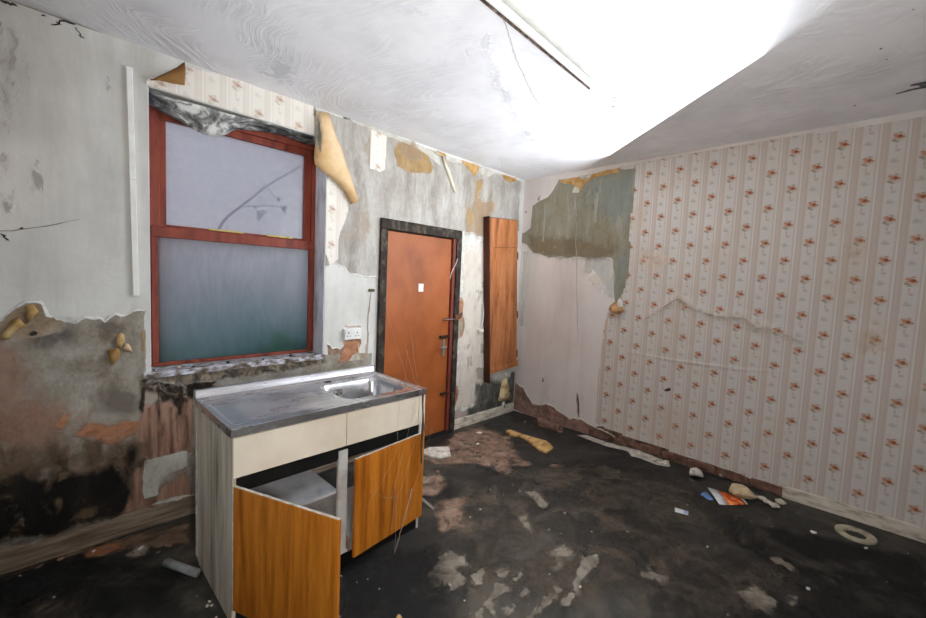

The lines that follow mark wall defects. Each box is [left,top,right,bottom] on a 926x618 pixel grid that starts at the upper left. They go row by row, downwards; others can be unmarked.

peeling [151,62,186,85]
flaking render [314,112,636,334]
damp [0,300,372,550]
flaking render [514,383,787,508]